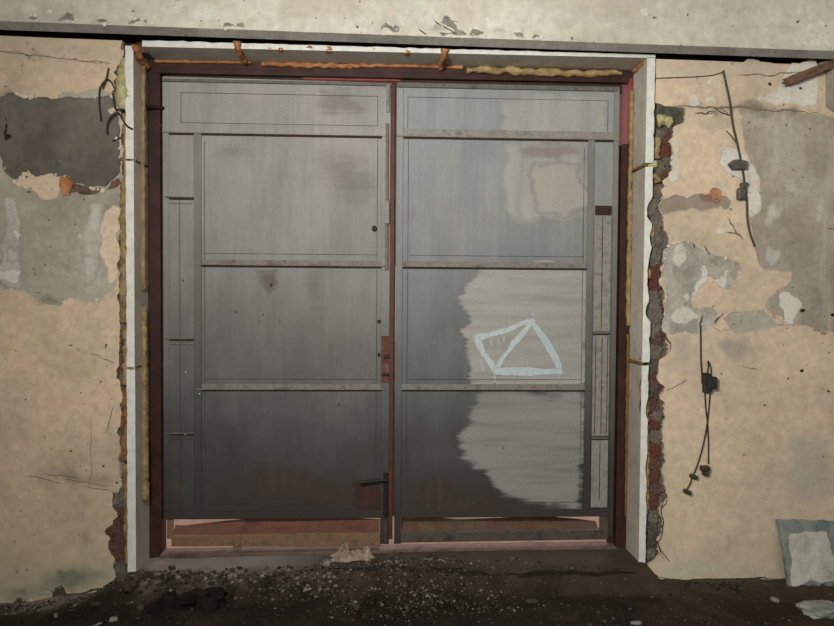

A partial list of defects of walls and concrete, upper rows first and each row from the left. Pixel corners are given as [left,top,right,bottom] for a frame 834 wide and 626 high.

crack [0,44,110,65]
spalling [380,22,402,33]
spalling [439,15,487,39]
spalling [0,67,124,308]
flaking render [110,323,127,386]
peeling [644,106,834,560]
flaking render [105,447,128,576]